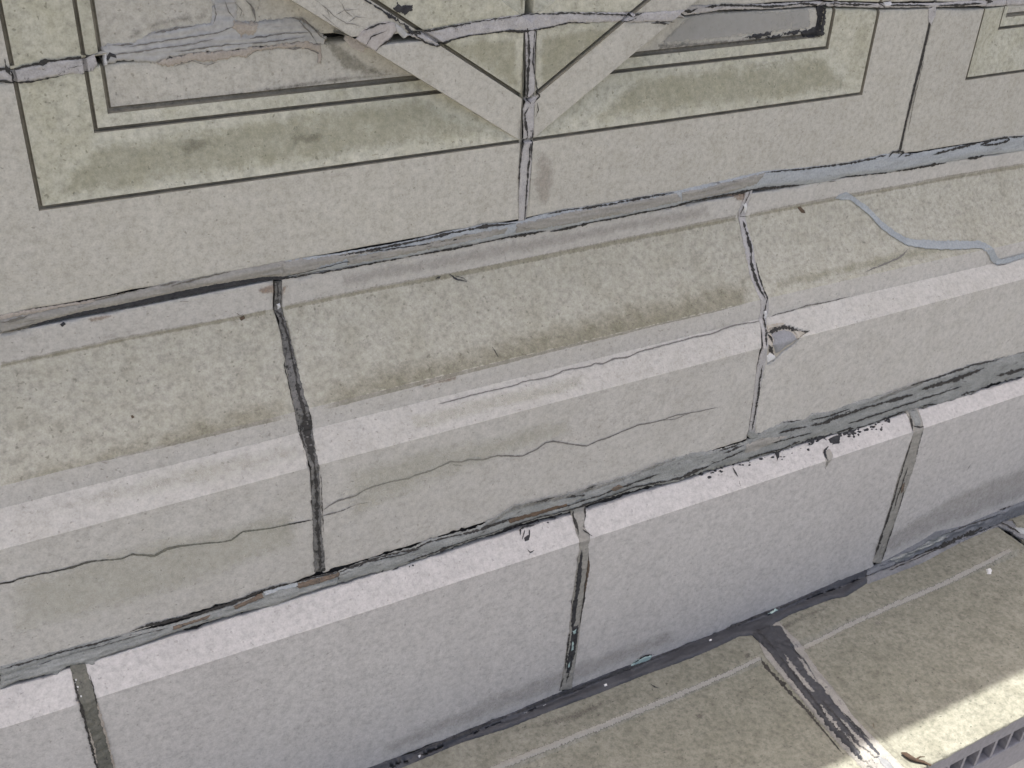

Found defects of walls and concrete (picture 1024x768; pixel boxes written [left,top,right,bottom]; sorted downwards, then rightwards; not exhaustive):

peeling [98,0,327,67]
crack [835,192,1024,273]
crack [439,296,850,404]
spalling [766,323,809,363]
peeling [700,418,890,486]
crack [0,408,713,585]